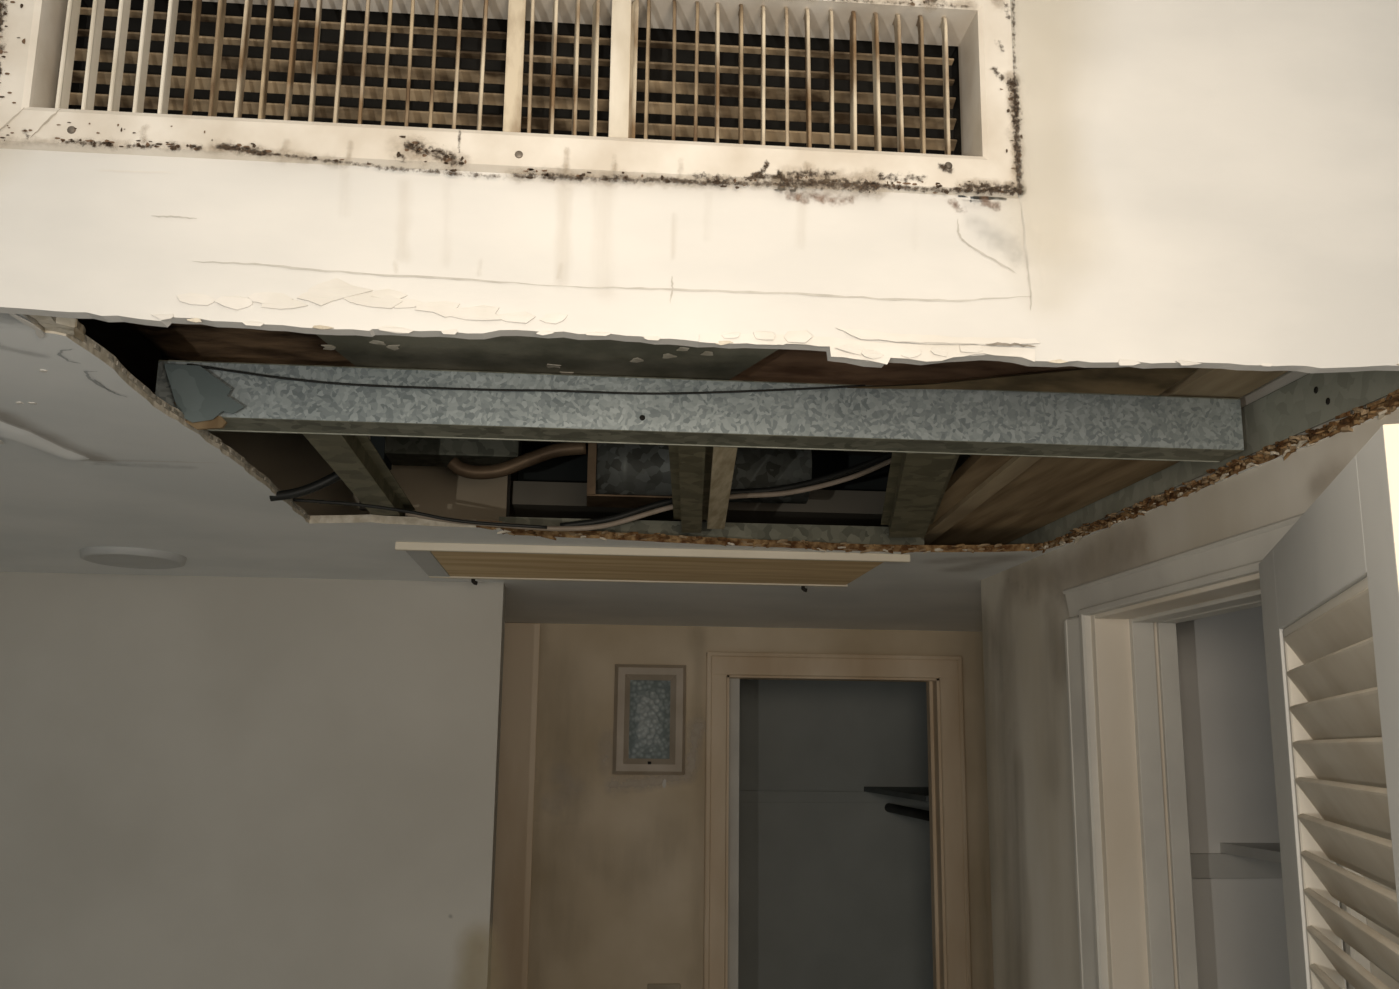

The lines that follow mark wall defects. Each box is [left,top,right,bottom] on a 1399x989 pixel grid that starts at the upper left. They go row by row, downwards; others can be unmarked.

water stain [0,1,25,104]
water stain [55,0,1023,195]
peeling [93,344,279,492]
peeling [699,328,1068,365]
spalling [480,389,1399,554]